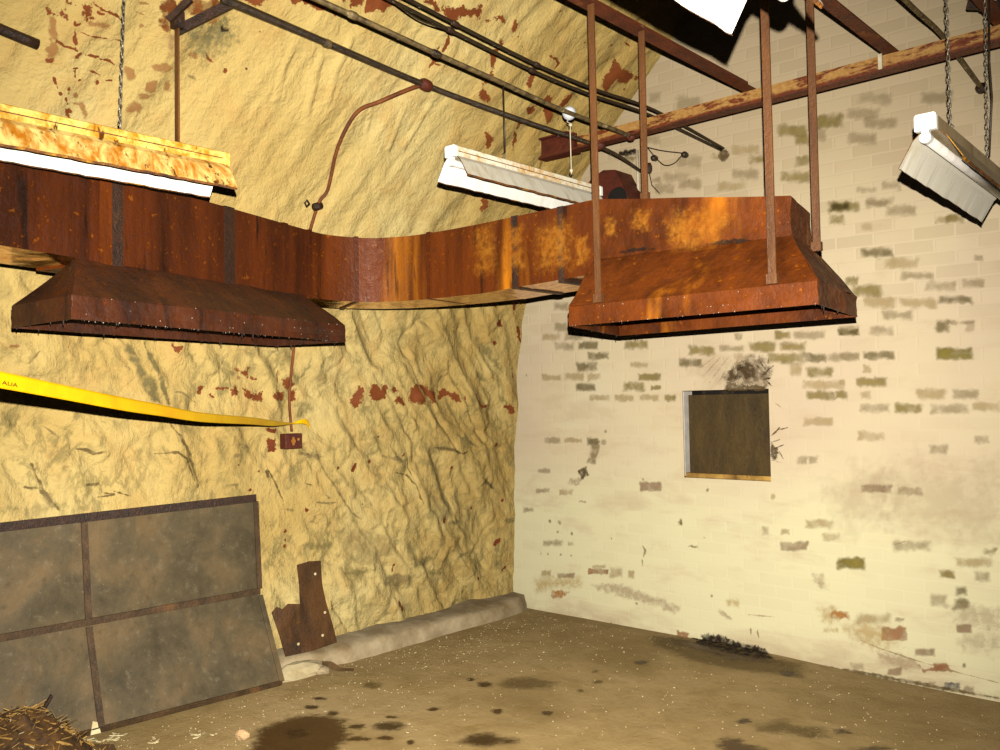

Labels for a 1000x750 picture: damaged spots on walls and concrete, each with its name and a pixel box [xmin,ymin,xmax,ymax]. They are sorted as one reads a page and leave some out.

flaking render [780,116,836,143]
flaking render [831,203,858,222]
flaking render [862,249,896,266]
flaking render [848,278,970,318]
water stain [725,355,771,391]
flaking render [680,331,894,399]
flaking render [937,348,972,359]
flaking render [896,391,943,412]
flaking render [955,588,968,608]
spalling [859,616,905,640]
water stain [674,631,772,661]
spalling [916,649,952,672]